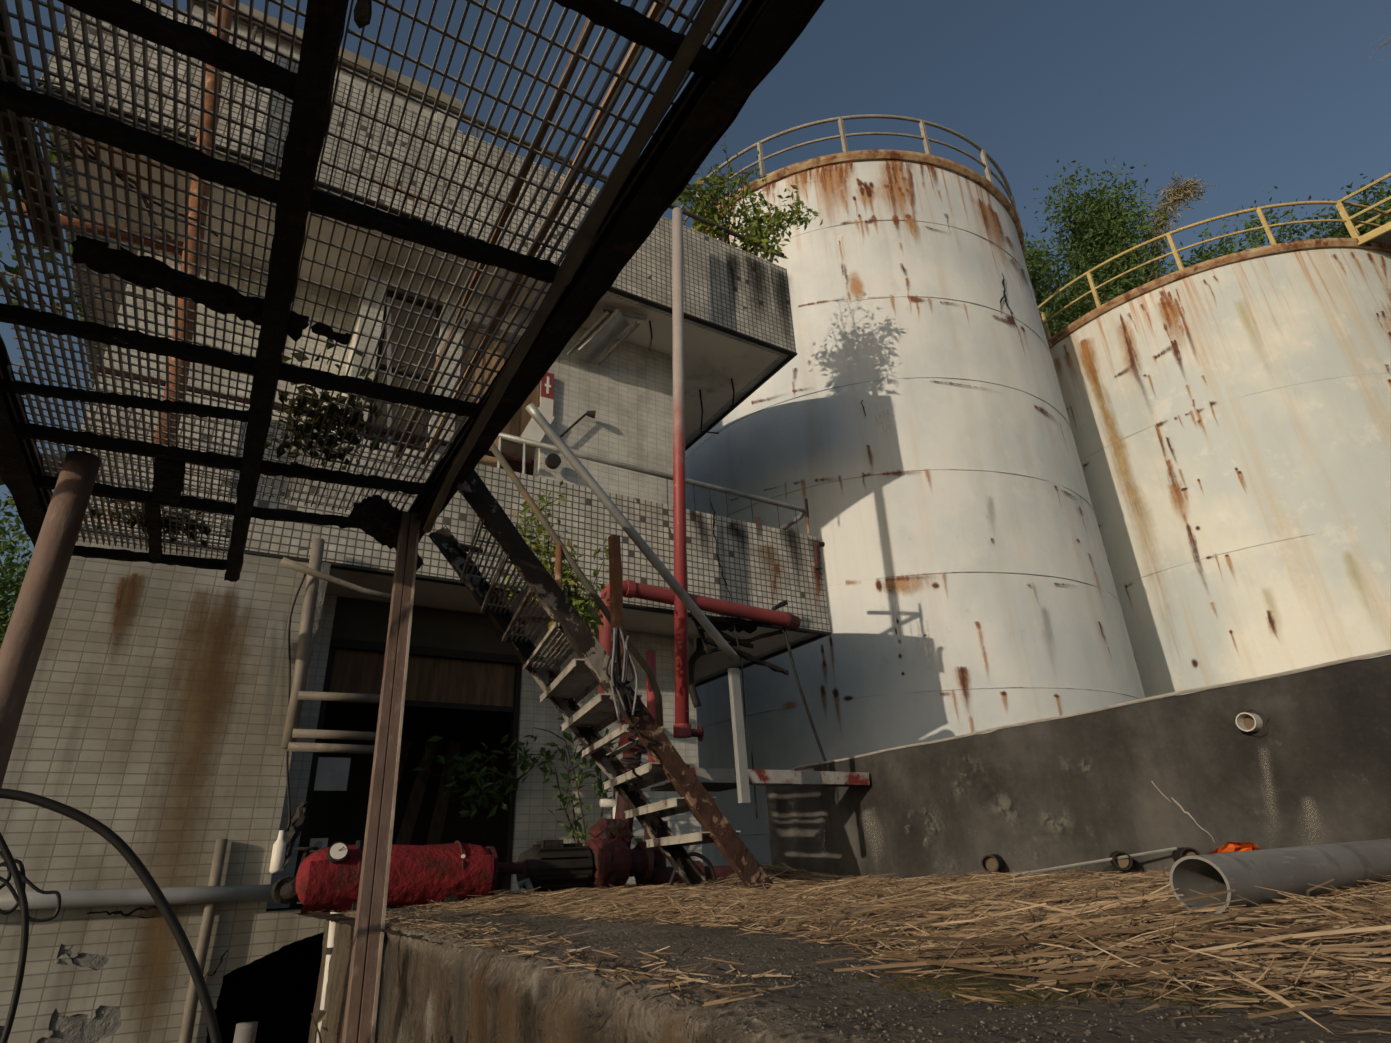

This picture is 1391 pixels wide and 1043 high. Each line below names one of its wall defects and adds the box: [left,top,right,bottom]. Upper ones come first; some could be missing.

corrosion [795,160,949,234]
water stain [726,254,789,316]
corrosion [870,243,966,312]
corrosion [1115,289,1191,389]
corrosion [1055,339,1143,520]
corrosion [1155,385,1232,570]
water stain [728,523,745,545]
water stain [782,529,821,571]
corrosion [876,573,945,591]
corrosion [940,666,968,706]
spalling [52,944,109,970]
spalling [36,1005,121,1043]